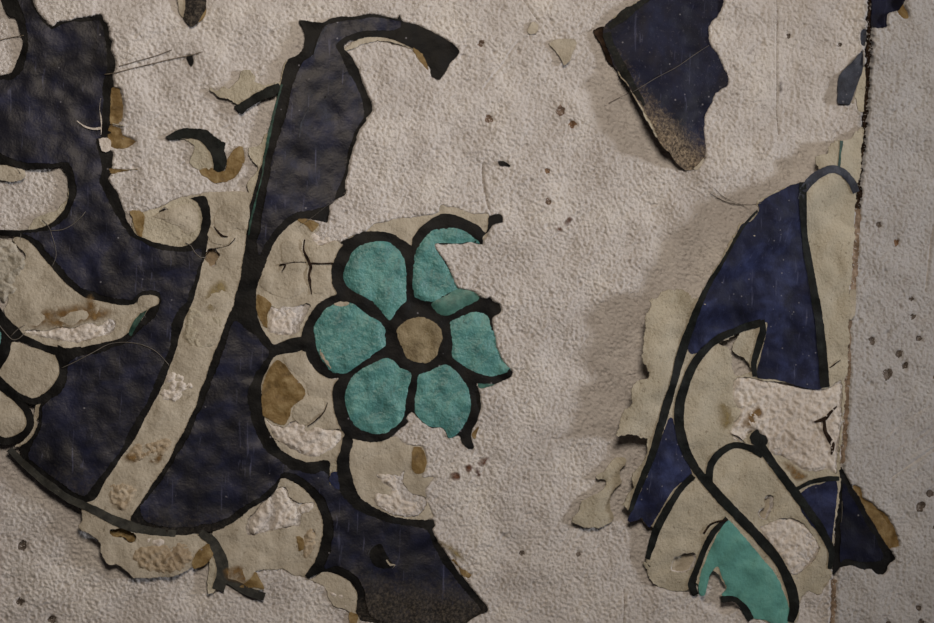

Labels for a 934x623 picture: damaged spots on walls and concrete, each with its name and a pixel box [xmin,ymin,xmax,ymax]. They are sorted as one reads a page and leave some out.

spalling [555,104,577,129]
peeling [593,0,728,171]
crack [850,0,873,290]
peeling [0,0,513,623]
peeling [616,127,899,623]
crack [814,319,852,464]
spalling [882,350,908,381]
crack [829,579,837,623]